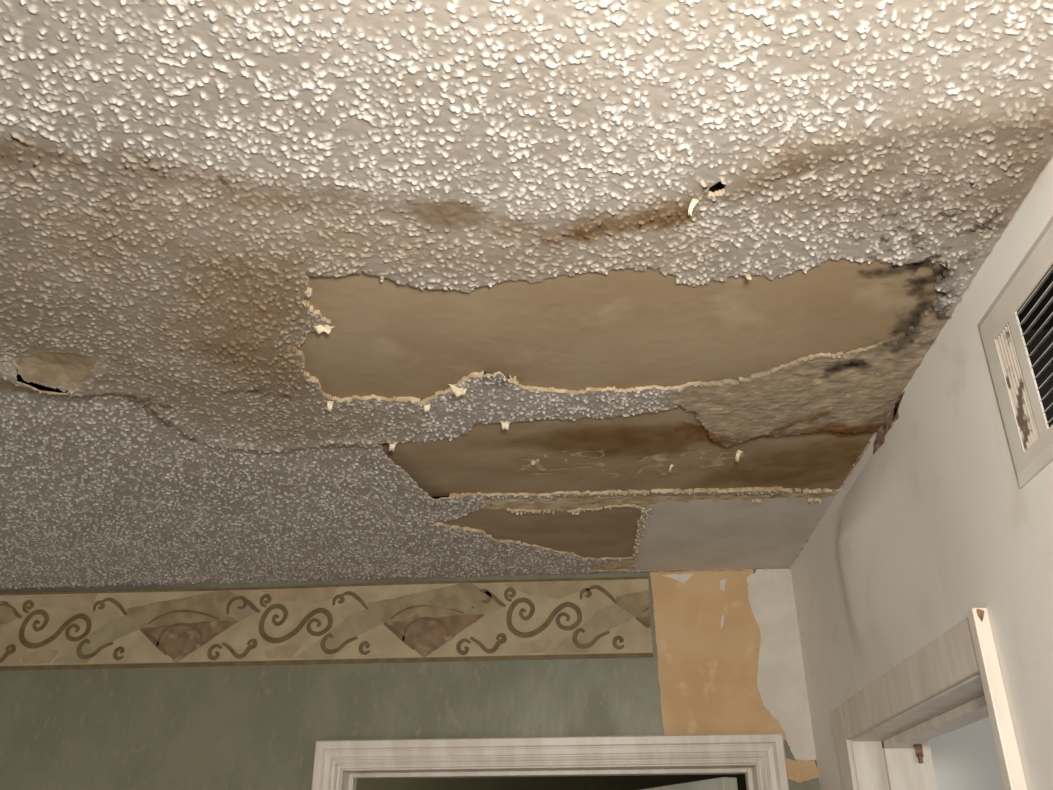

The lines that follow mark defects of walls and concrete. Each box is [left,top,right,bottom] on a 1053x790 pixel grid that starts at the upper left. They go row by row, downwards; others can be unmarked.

peeling [297,258,945,413]
damp [825,360,868,376]
damp [903,265,948,339]
peeling [354,391,905,558]
peeling [663,573,694,584]